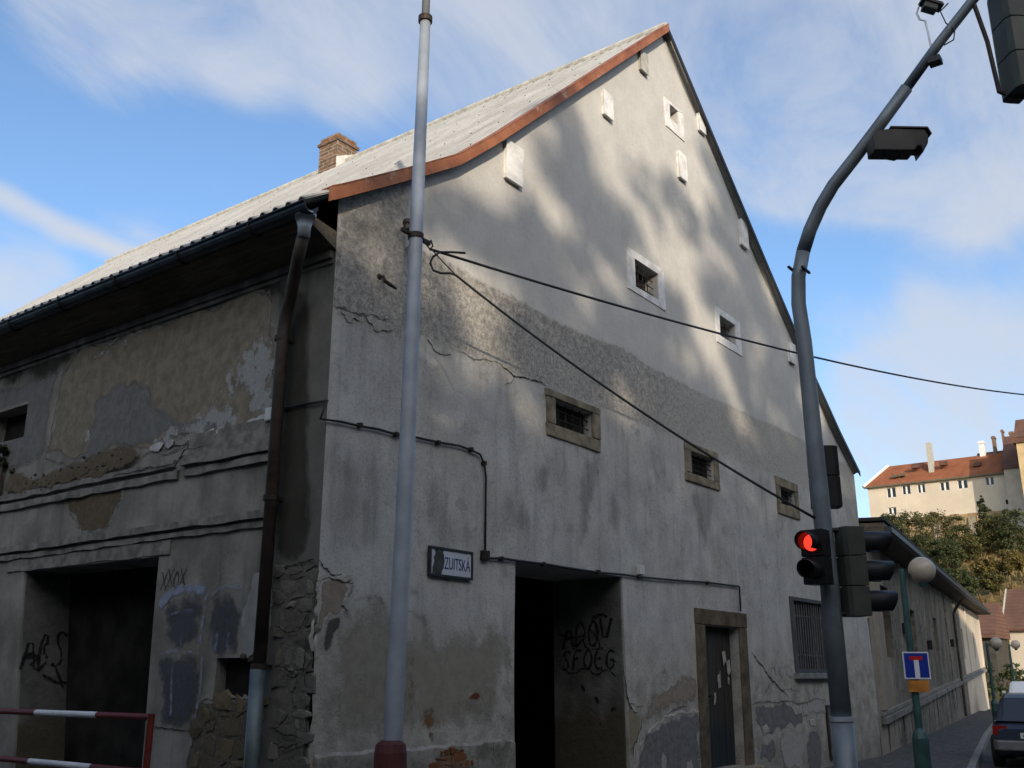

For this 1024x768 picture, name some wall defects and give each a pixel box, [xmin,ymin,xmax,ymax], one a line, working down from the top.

spalling [45,289,277,467]
crack [463,352,546,386]
spalling [64,489,124,535]
spalling [261,559,355,768]
spalling [154,689,248,768]
spalling [429,747,474,768]
spalling [634,677,701,768]